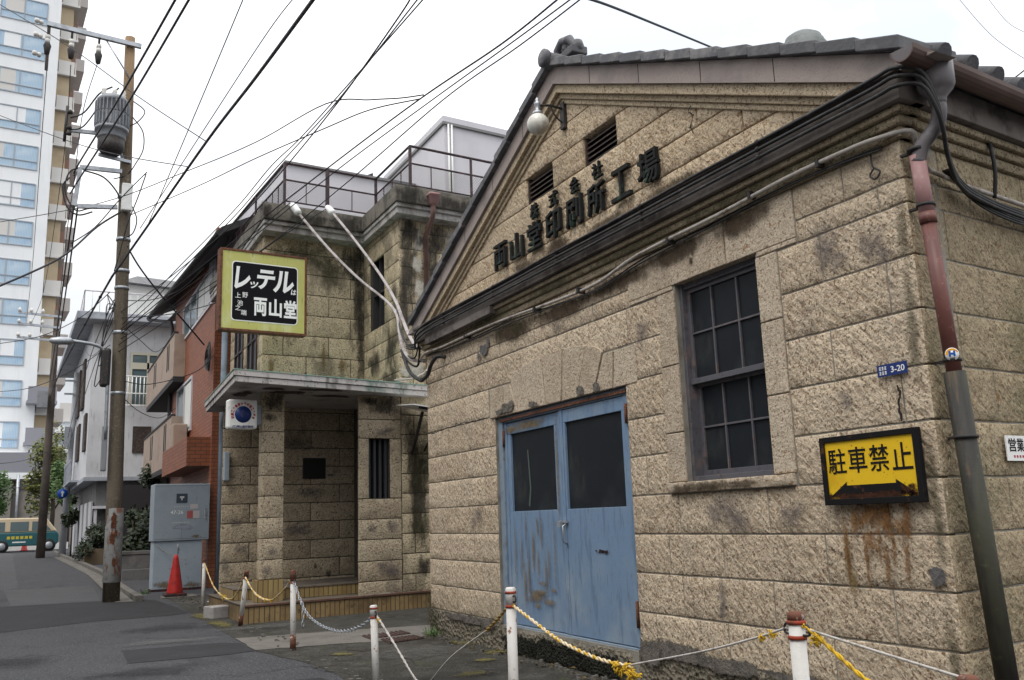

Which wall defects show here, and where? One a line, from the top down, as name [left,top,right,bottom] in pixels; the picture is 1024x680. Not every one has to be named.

water stain [293,214,358,233]
water stain [342,220,452,382]
water stain [365,397,394,413]
crack [896,385,904,421]
water stain [405,420,426,532]
rust [109,511,118,544]
rust [514,521,556,608]
rust [843,503,911,593]